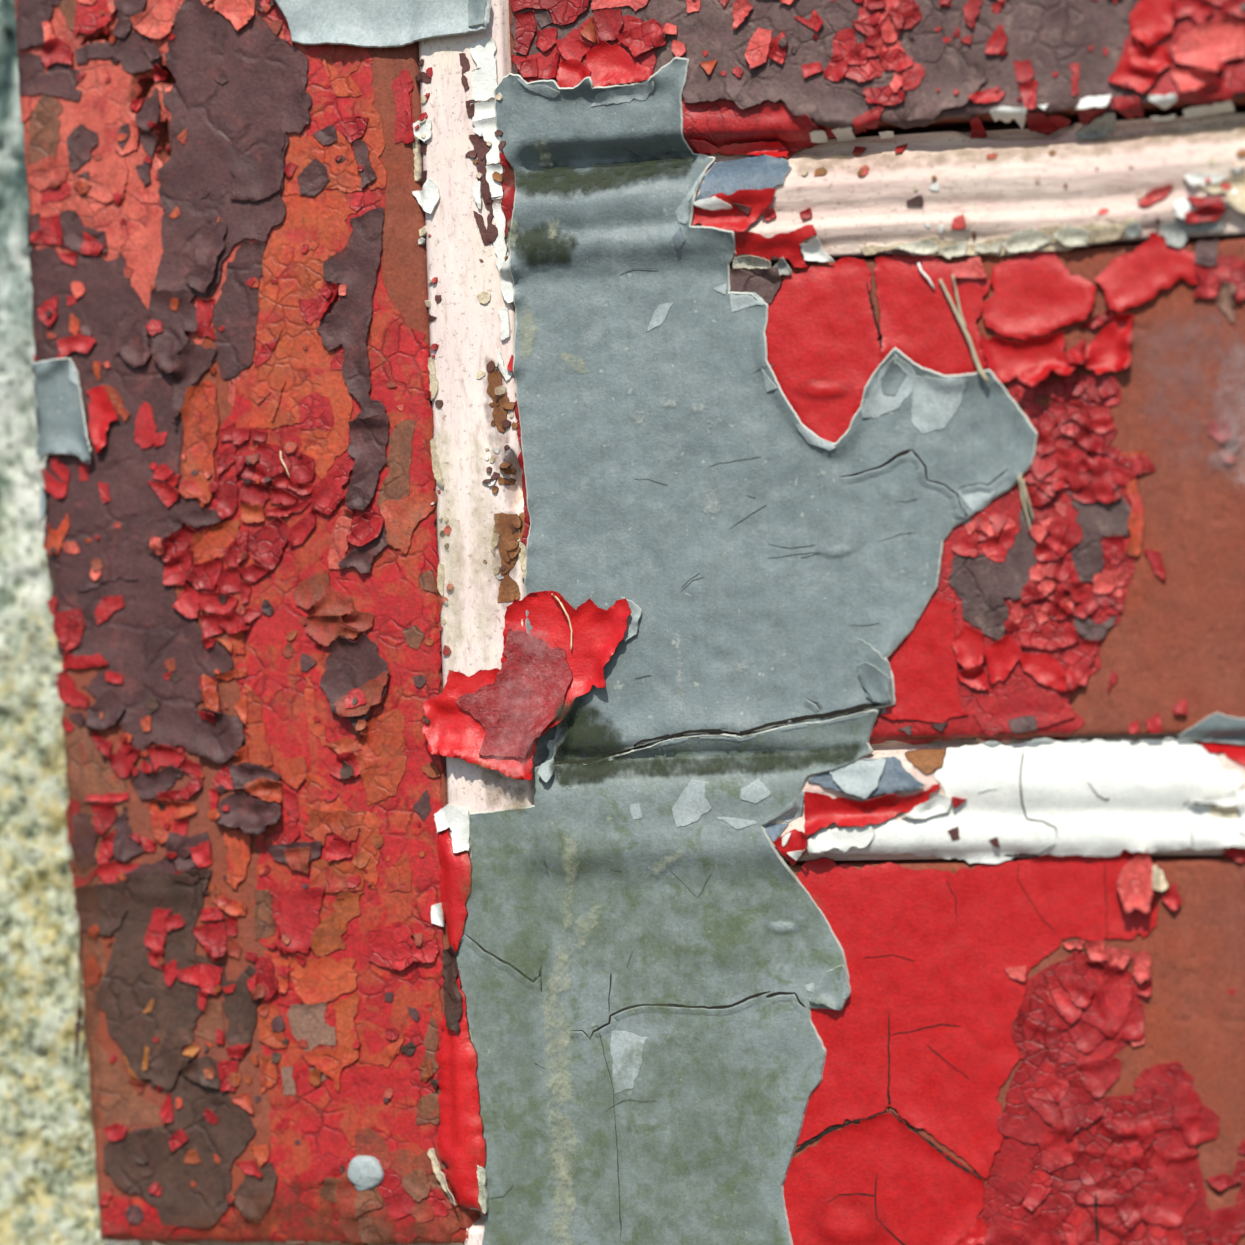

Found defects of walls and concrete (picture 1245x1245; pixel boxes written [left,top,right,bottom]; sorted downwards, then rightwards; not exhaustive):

peeling [510,0,1245,160]
peeling [14,0,642,1245]
crack [770,544,822,558]
peeling [456,37,1245,1245]
crack [620,698,886,765]
crack [979,750,1057,933]
crack [458,934,551,993]
crack [569,951,805,1233]
crack [795,1017,985,1179]
crack [830,1175,906,1245]
crack [1092,1194,1100,1242]